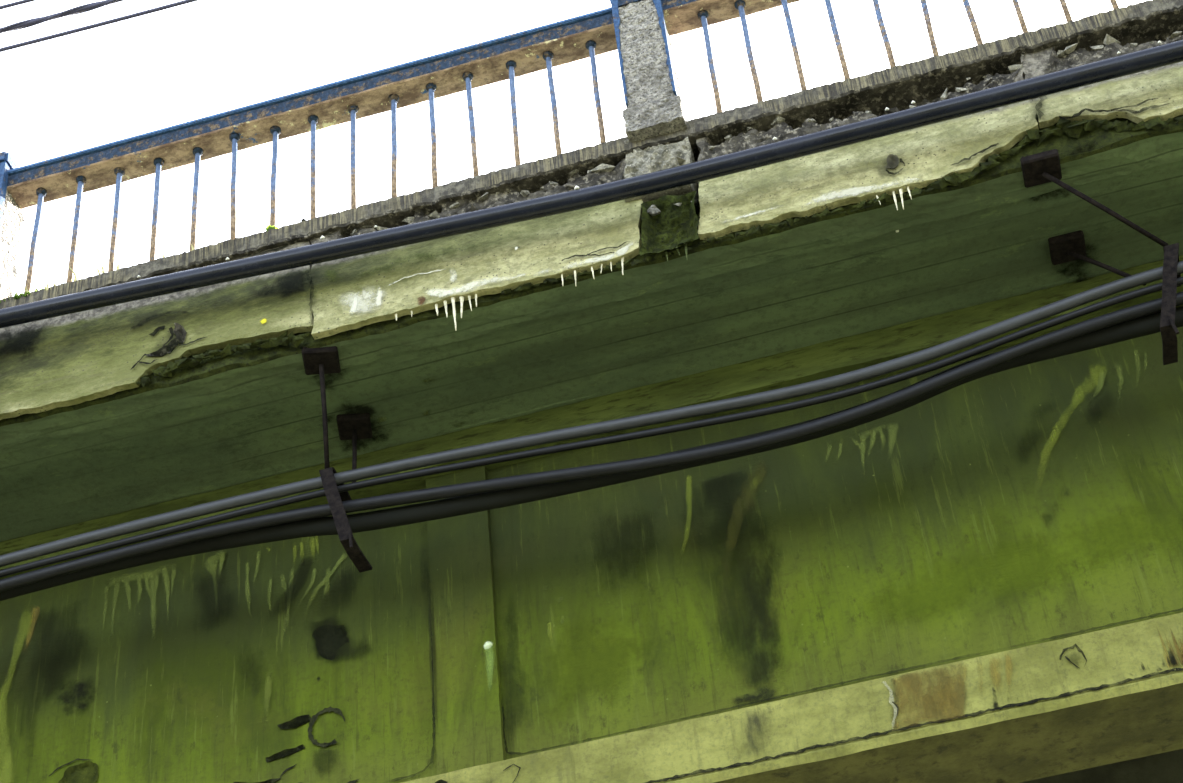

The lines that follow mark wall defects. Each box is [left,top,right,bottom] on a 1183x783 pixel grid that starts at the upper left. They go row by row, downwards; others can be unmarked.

crack [1059,98,1170,119]
spalling [337,52,1025,239]
crack [952,143,999,165]
spalling [0,115,1183,455]
water stain [104,568,175,624]
water stain [207,554,224,596]
water stain [268,537,347,616]
water stain [736,689,774,731]
crack [645,668,1183,783]